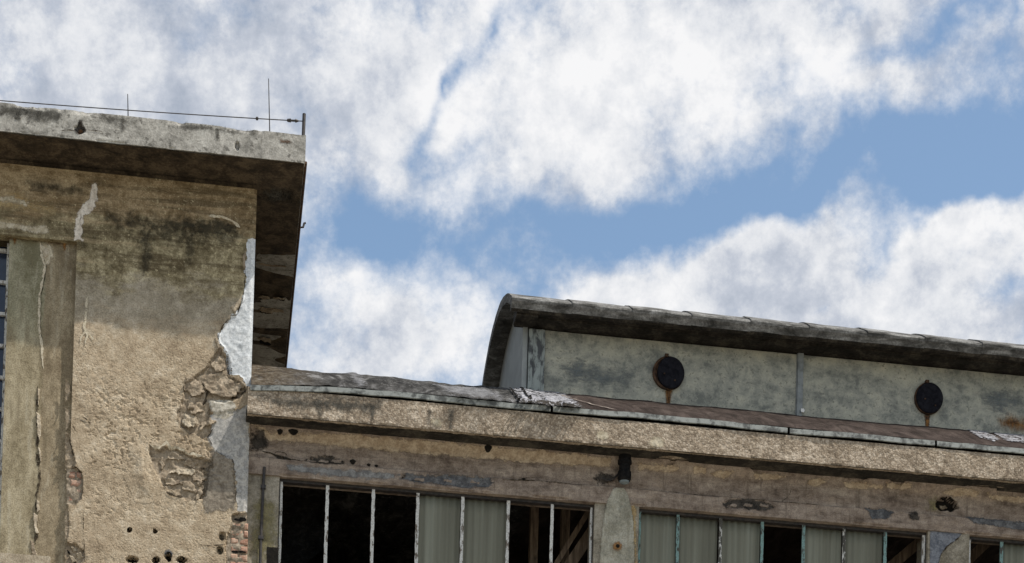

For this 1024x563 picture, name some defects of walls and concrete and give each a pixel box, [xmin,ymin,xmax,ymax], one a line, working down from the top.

damp [107,215,237,272]
flaking render [209,214,240,233]
crack [31,183,98,555]
peeling [149,238,617,563]
peeling [723,499,774,511]
peeling [935,487,1024,512]